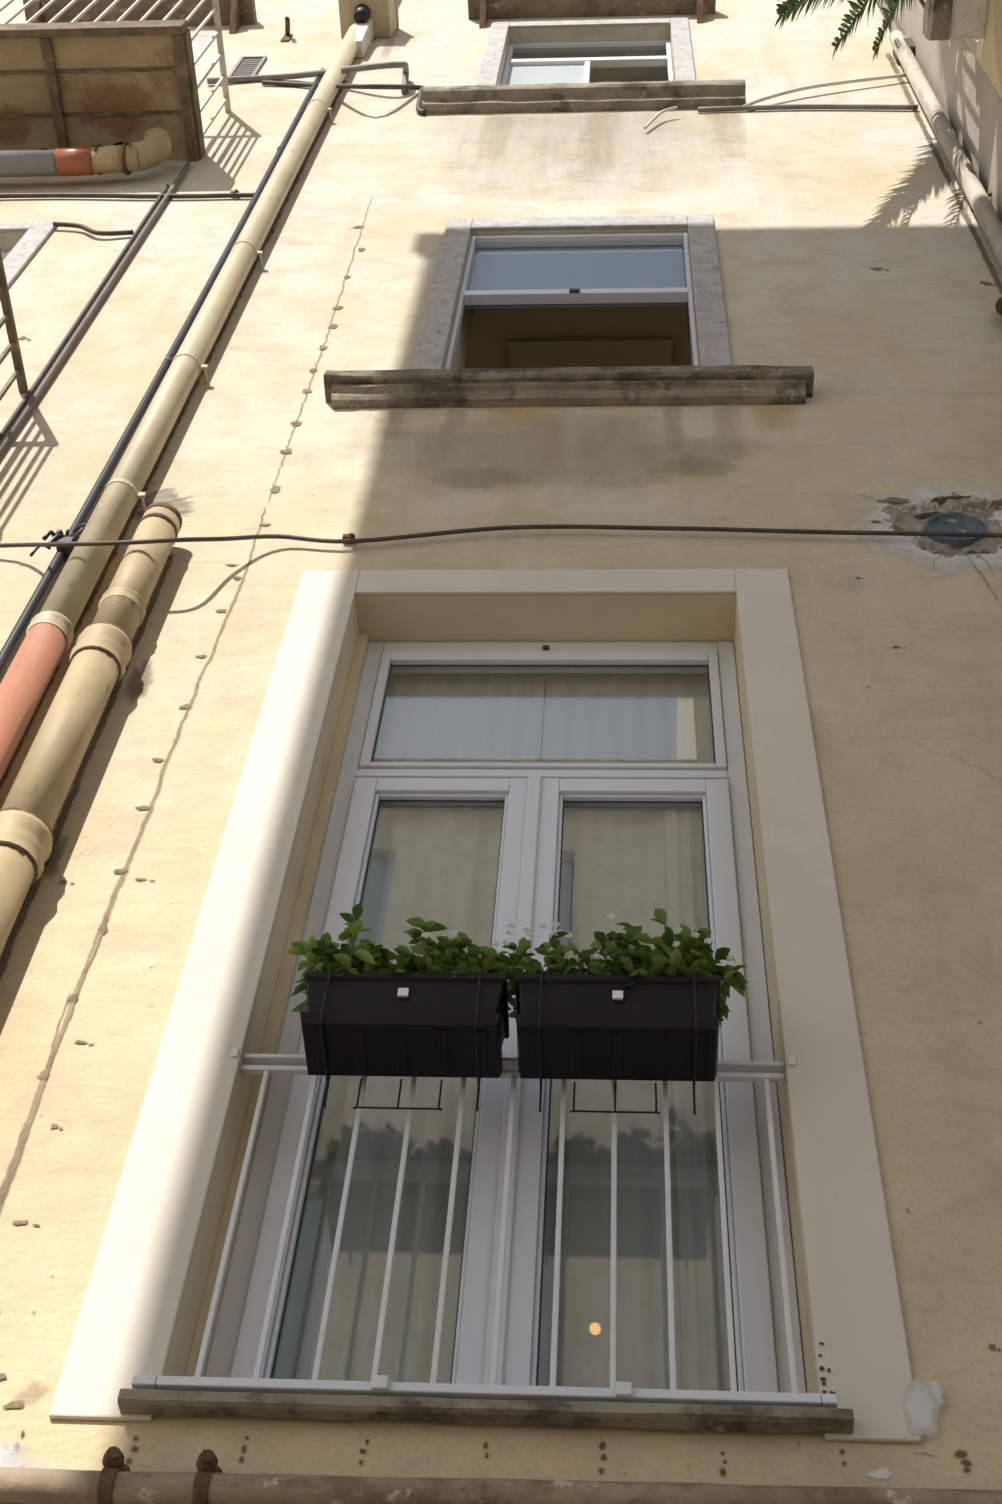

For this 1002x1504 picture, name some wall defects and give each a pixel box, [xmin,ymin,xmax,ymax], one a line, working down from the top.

spalling [864,487,1002,598]
peeling [904,1381,943,1434]
peeling [867,1468,892,1479]